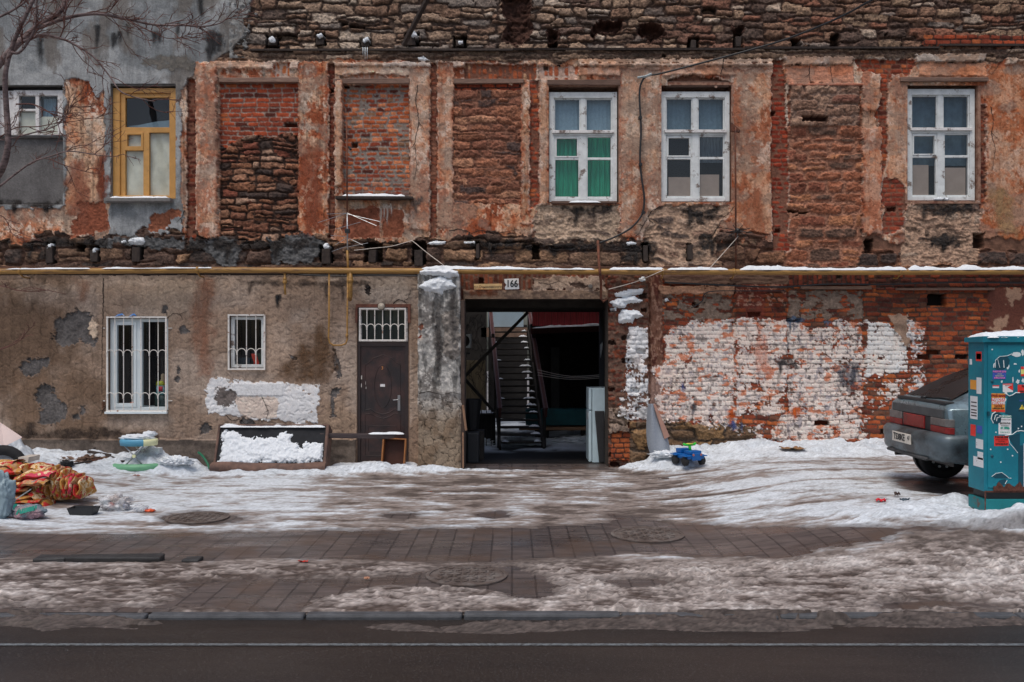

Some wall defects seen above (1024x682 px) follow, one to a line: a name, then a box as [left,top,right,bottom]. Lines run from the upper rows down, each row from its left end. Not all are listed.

spalling [500,0,564,48]
spalling [590,18,625,44]
spalling [636,22,667,45]
spalling [148,79,197,243]
spalling [71,201,109,238]
spalling [643,203,730,267]
spalling [20,358,86,427]
spalling [52,307,98,348]
damp [282,325,338,381]
peeling [617,318,926,442]